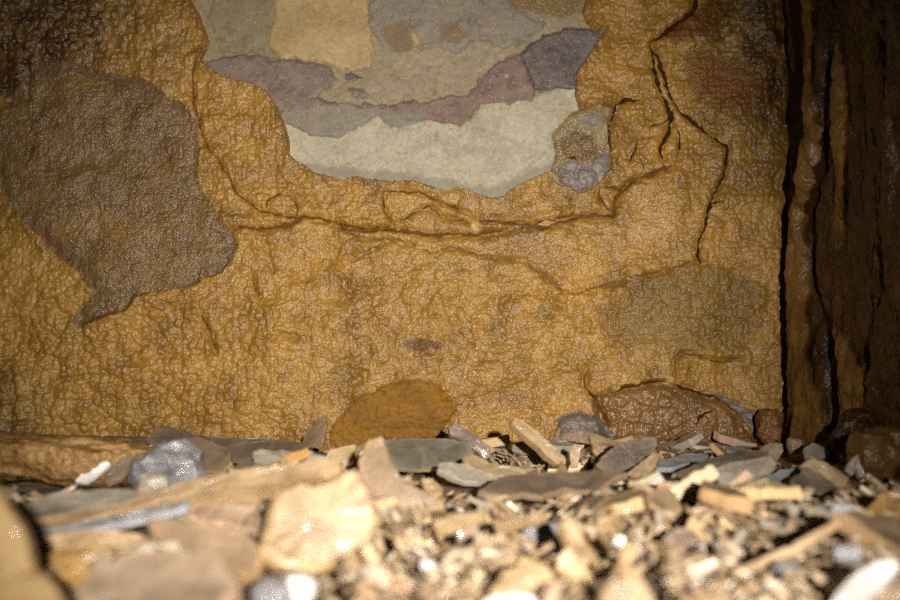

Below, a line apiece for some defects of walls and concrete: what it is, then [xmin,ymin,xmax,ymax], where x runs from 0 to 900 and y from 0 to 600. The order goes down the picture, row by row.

leakage [0,61,238,327]
spalling [192,0,611,198]
crack [192,0,729,294]